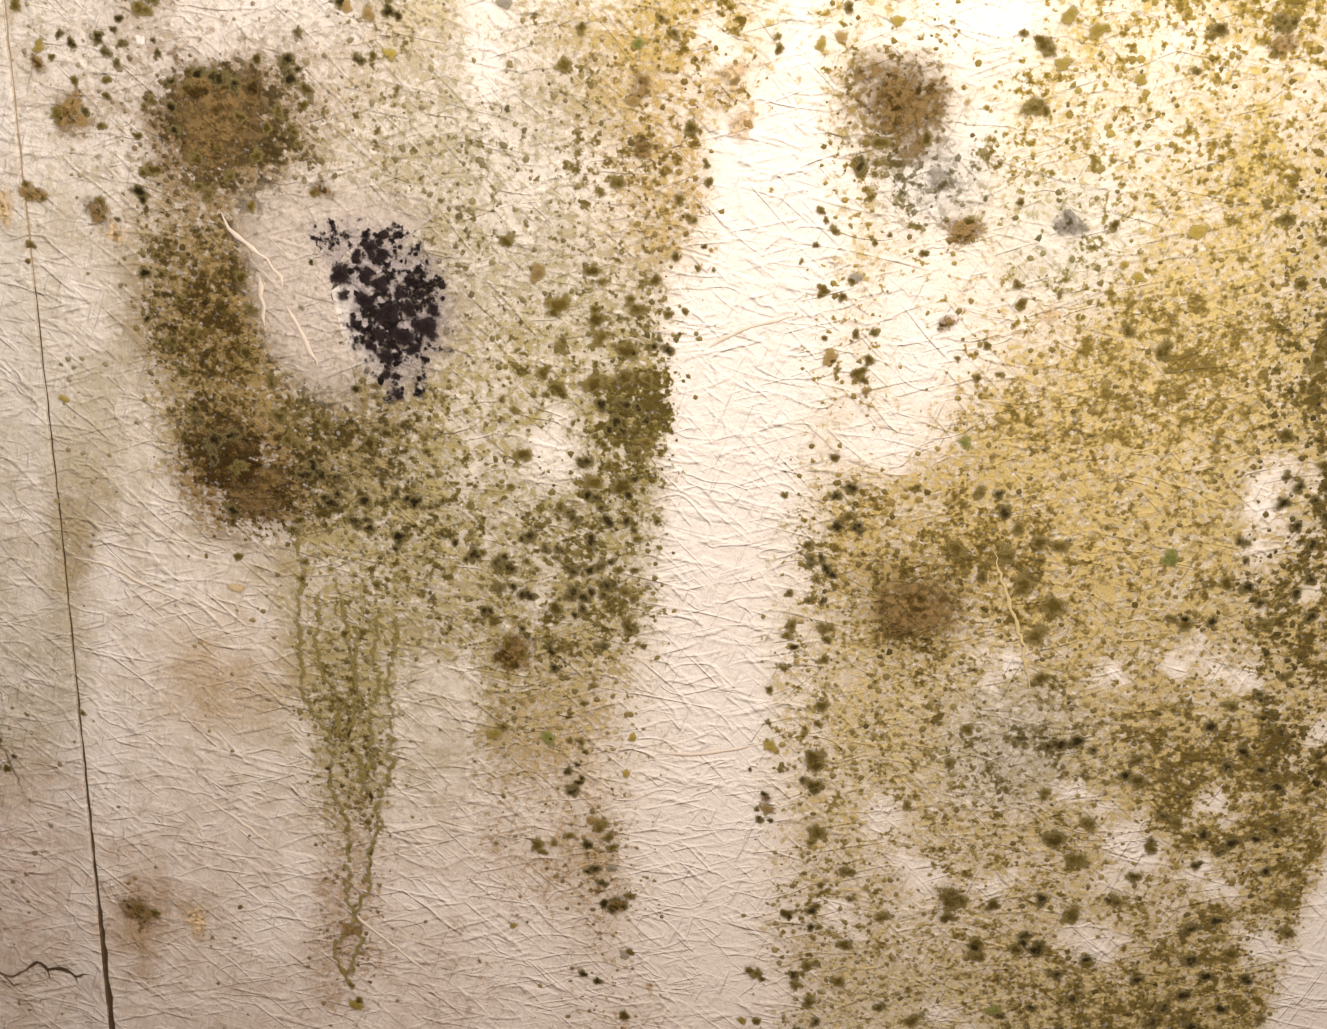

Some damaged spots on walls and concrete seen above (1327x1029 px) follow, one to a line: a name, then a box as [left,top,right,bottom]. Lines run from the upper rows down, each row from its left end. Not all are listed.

crack [0,961,95,986]
water stain [0,0,798,1029]
water stain [737,0,1327,1029]